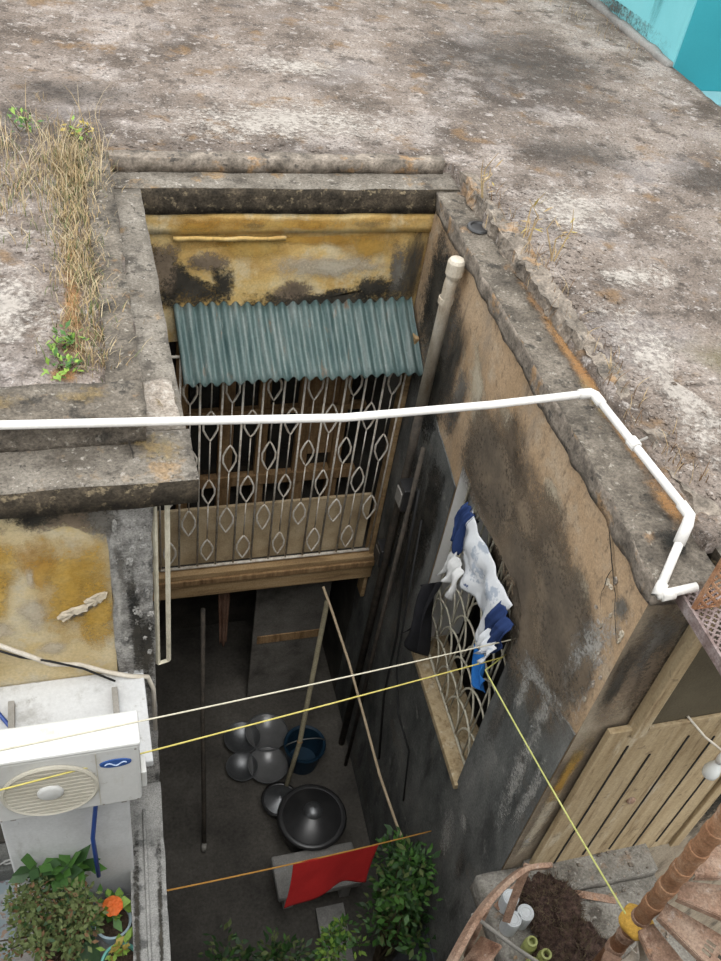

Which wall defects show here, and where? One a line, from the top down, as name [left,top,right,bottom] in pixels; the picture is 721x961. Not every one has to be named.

water stain [603,0,649,36]
water stain [152,244,235,309]
water stain [244,232,467,443]
water stain [0,510,118,643]
spalling [20,519,154,654]
water stain [114,548,155,681]